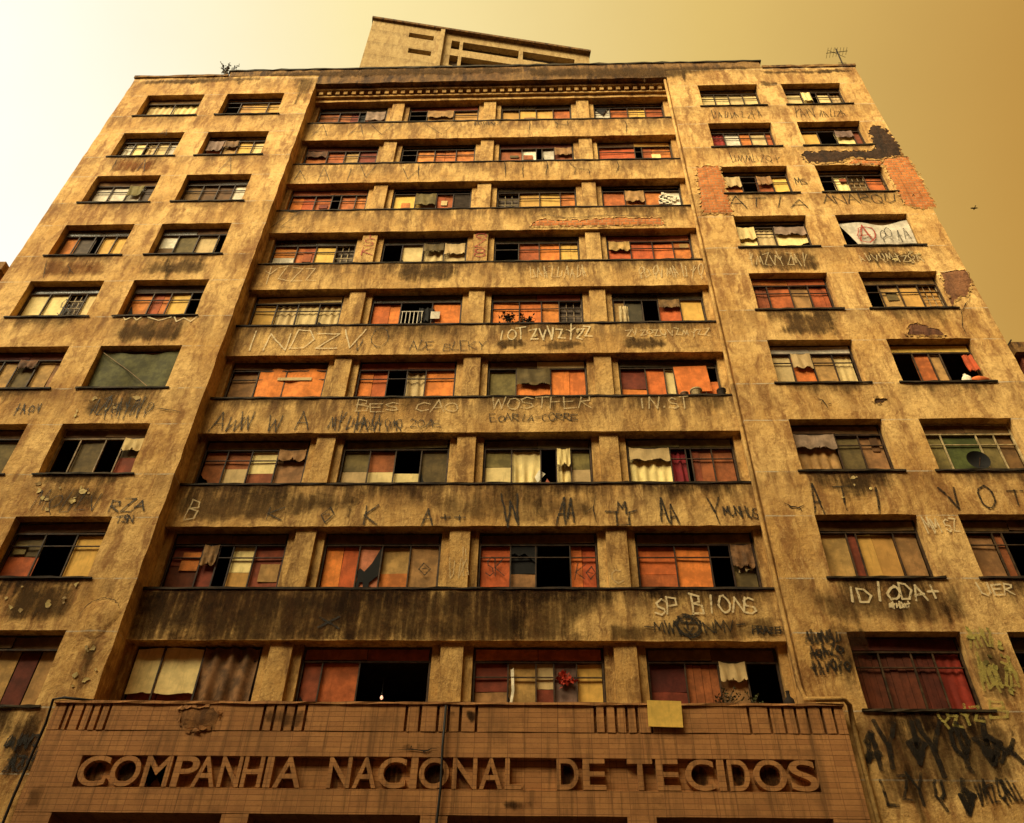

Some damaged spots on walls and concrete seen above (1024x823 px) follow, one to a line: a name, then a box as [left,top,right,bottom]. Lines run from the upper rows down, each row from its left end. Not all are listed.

spalling [800,125,937,210]
spalling [694,165,734,215]
spalling [529,216,666,228]
spalling [937,269,974,306]
spalling [905,322,947,338]
spalling [175,704,223,733]
water stain [0,708,37,769]